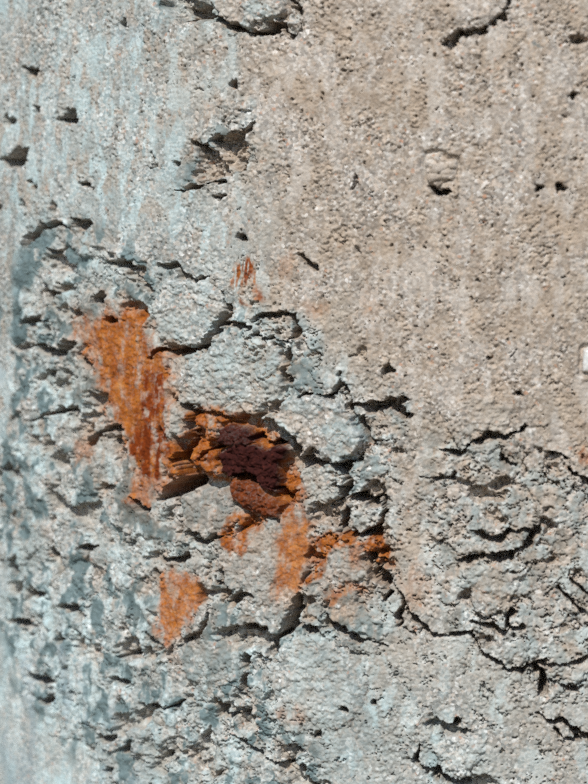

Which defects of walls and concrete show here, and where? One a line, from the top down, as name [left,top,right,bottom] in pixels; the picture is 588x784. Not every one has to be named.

corrosion [142,555,216,663]
corrosion [53,276,438,617]
spalling [0,198,588,784]
crack [105,256,588,784]